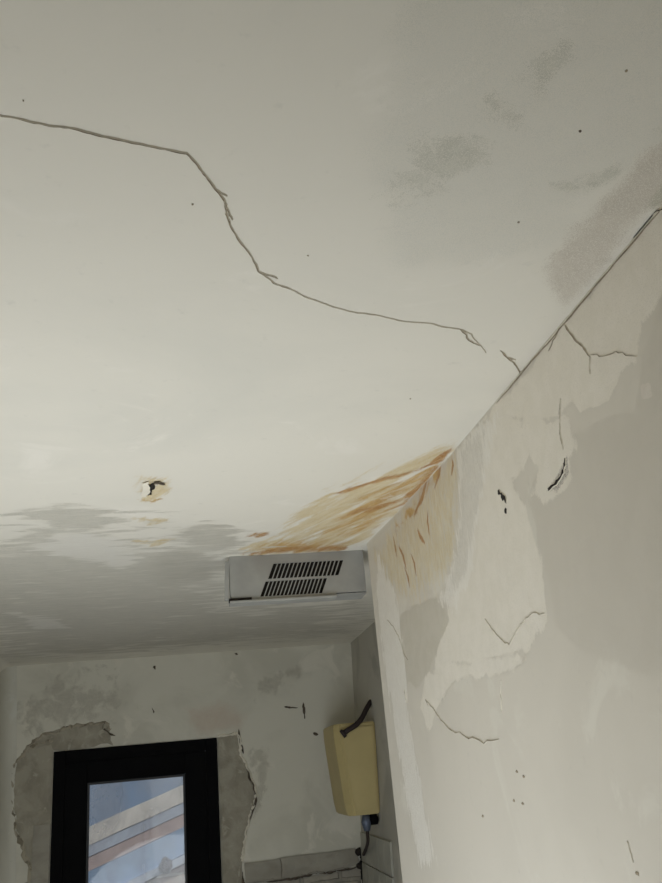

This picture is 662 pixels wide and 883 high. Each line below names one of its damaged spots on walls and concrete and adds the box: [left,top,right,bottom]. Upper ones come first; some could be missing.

crack [0,114,662,401]
spalling [131,476,173,503]
corrosion [239,440,457,556]
spalling [547,456,569,492]
spalling [11,721,115,883]